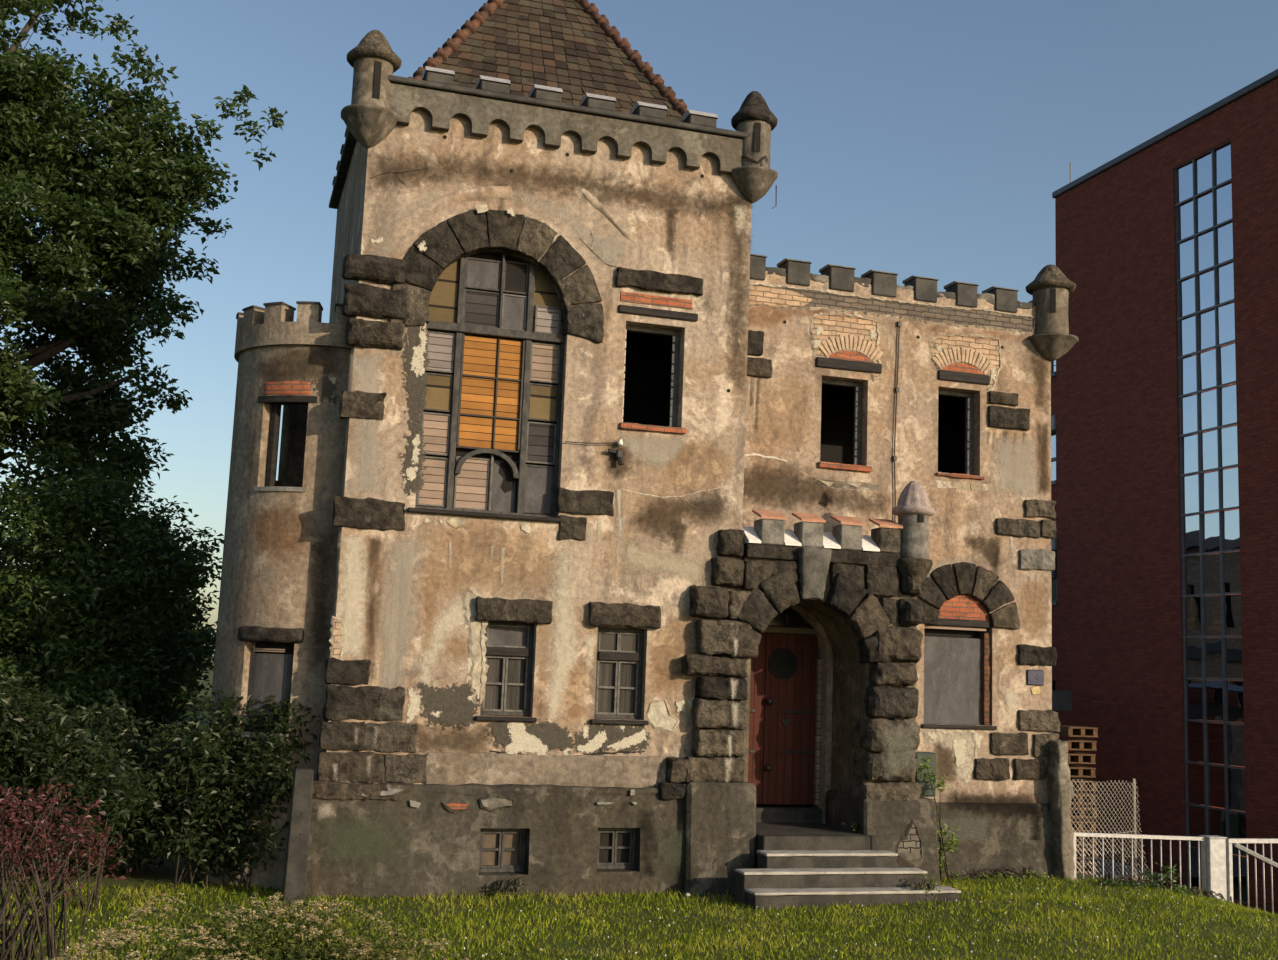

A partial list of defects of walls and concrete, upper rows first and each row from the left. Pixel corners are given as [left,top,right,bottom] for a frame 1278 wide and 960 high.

flaking render [398,326,430,496]
water stain [617,489,705,582]
water stain [339,536,416,686]
water stain [419,598,469,685]
flaking render [407,586,694,755]